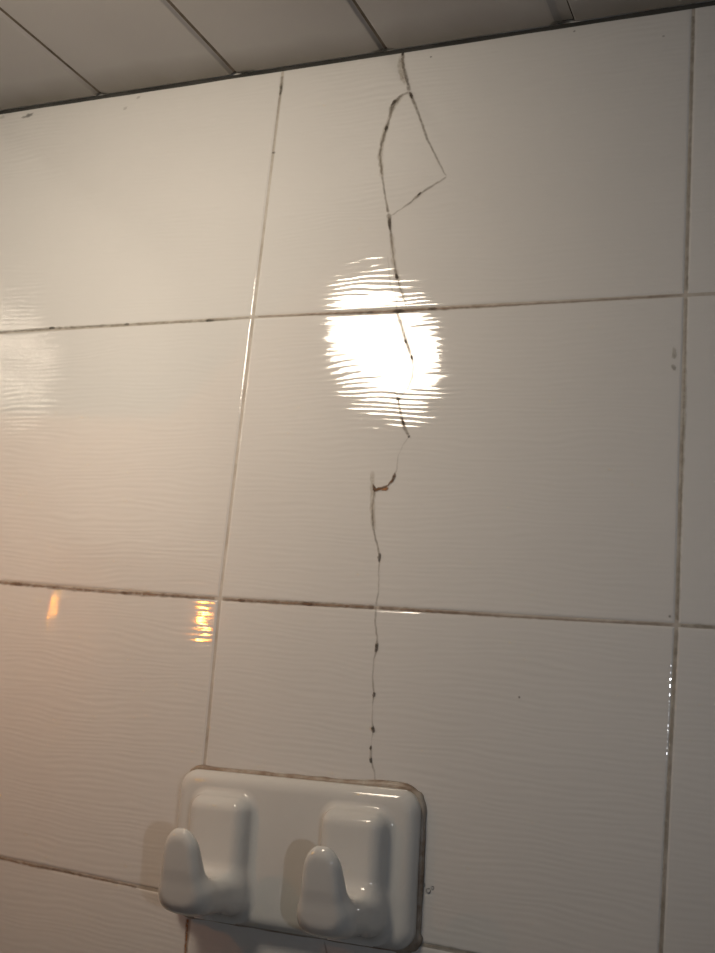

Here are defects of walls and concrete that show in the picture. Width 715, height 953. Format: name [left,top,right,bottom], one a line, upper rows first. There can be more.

crack [385,53,415,132]